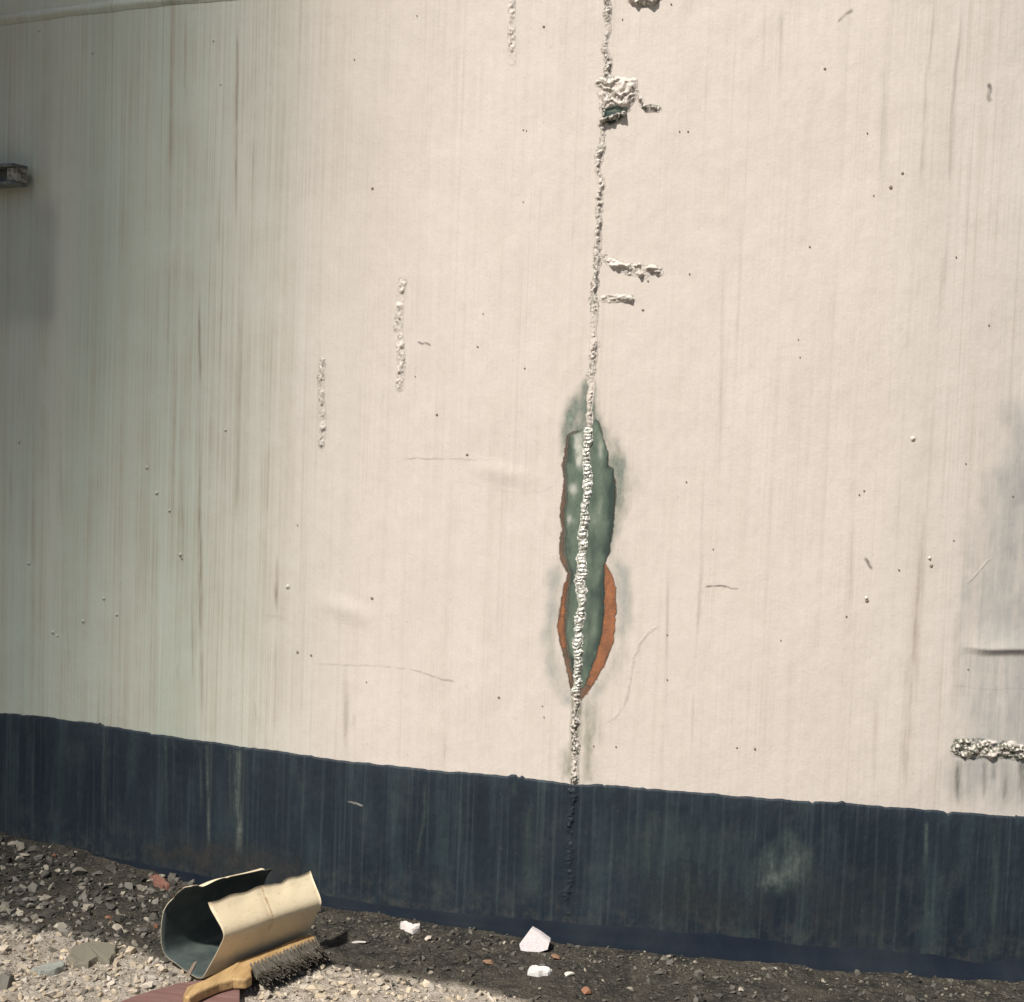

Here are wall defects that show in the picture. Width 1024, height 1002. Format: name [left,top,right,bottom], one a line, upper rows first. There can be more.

damp [563,382,594,443]
damp [610,455,625,506]
peeling [557,419,617,699]